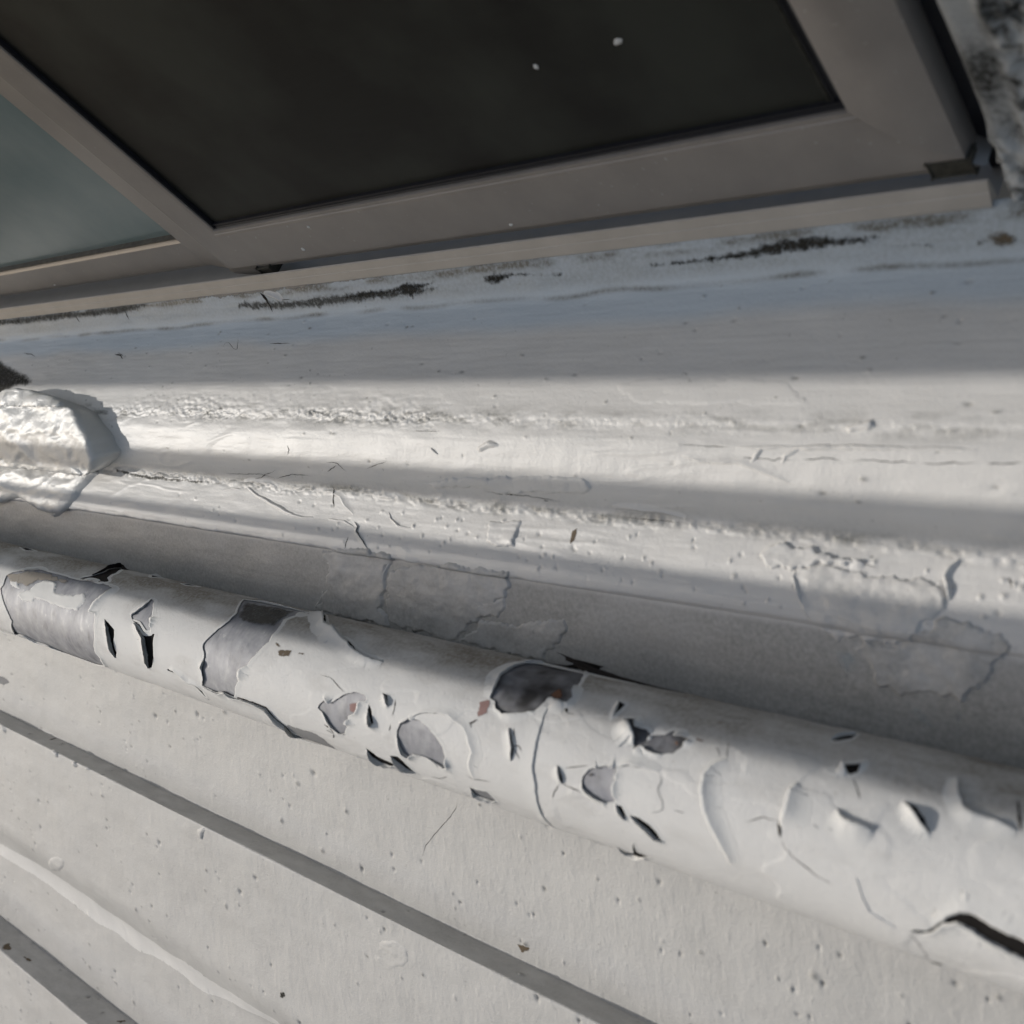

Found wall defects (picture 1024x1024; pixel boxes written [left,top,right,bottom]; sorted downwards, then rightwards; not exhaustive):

water stain [671,236,876,265]
water stain [238,282,433,310]
crack [848,556,877,571]
peeling [0,566,120,668]
peeling [129,597,160,636]
peeling [196,599,383,700]
peeling [316,688,370,737]
peeling [394,713,456,777]
peeling [578,715,696,809]
peeling [824,759,869,779]